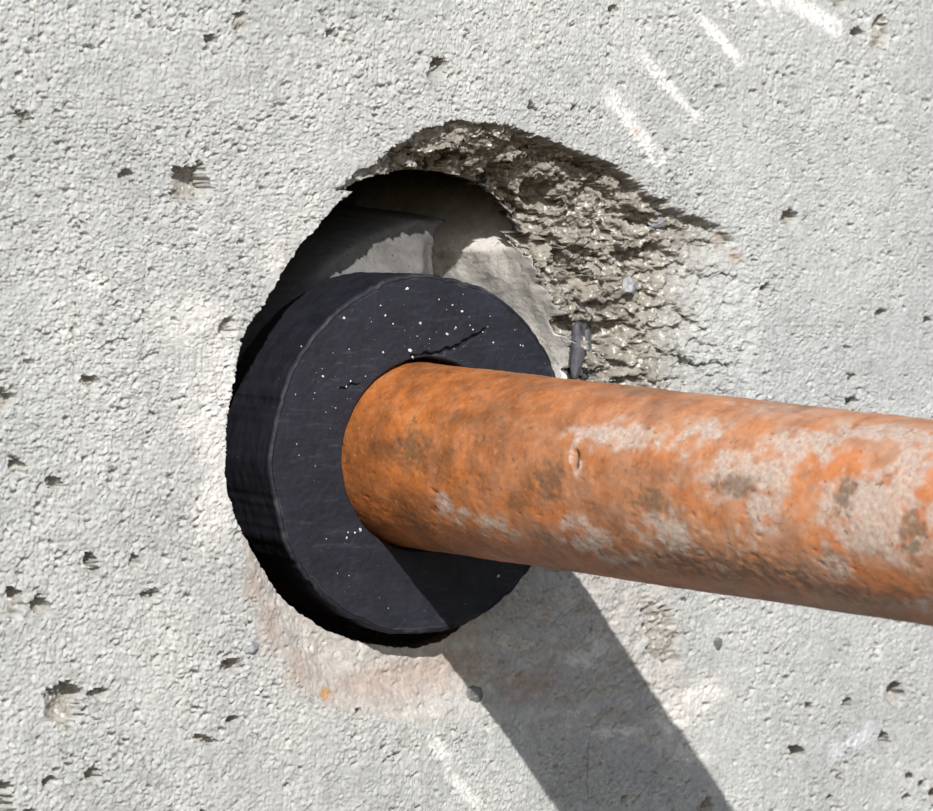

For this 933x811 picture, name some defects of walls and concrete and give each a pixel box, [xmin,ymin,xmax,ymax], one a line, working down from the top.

spalling [335,100,772,399]